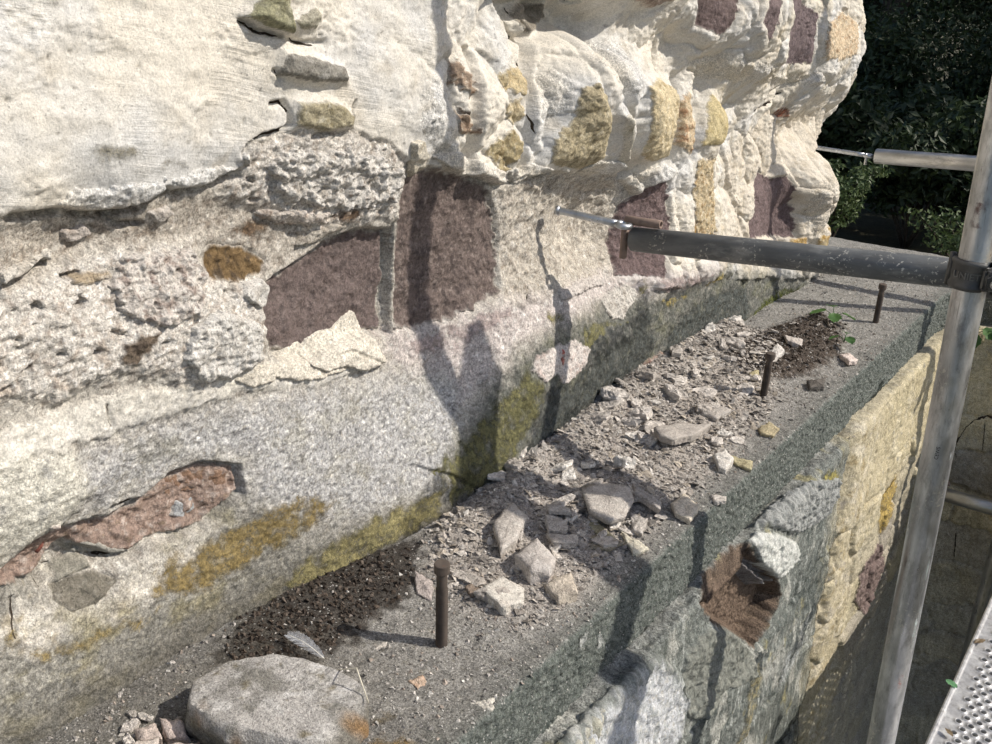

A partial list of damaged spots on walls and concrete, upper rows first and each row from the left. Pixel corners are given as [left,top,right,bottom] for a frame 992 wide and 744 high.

spalling [0,248,52,284]
spalling [58,56,554,388]